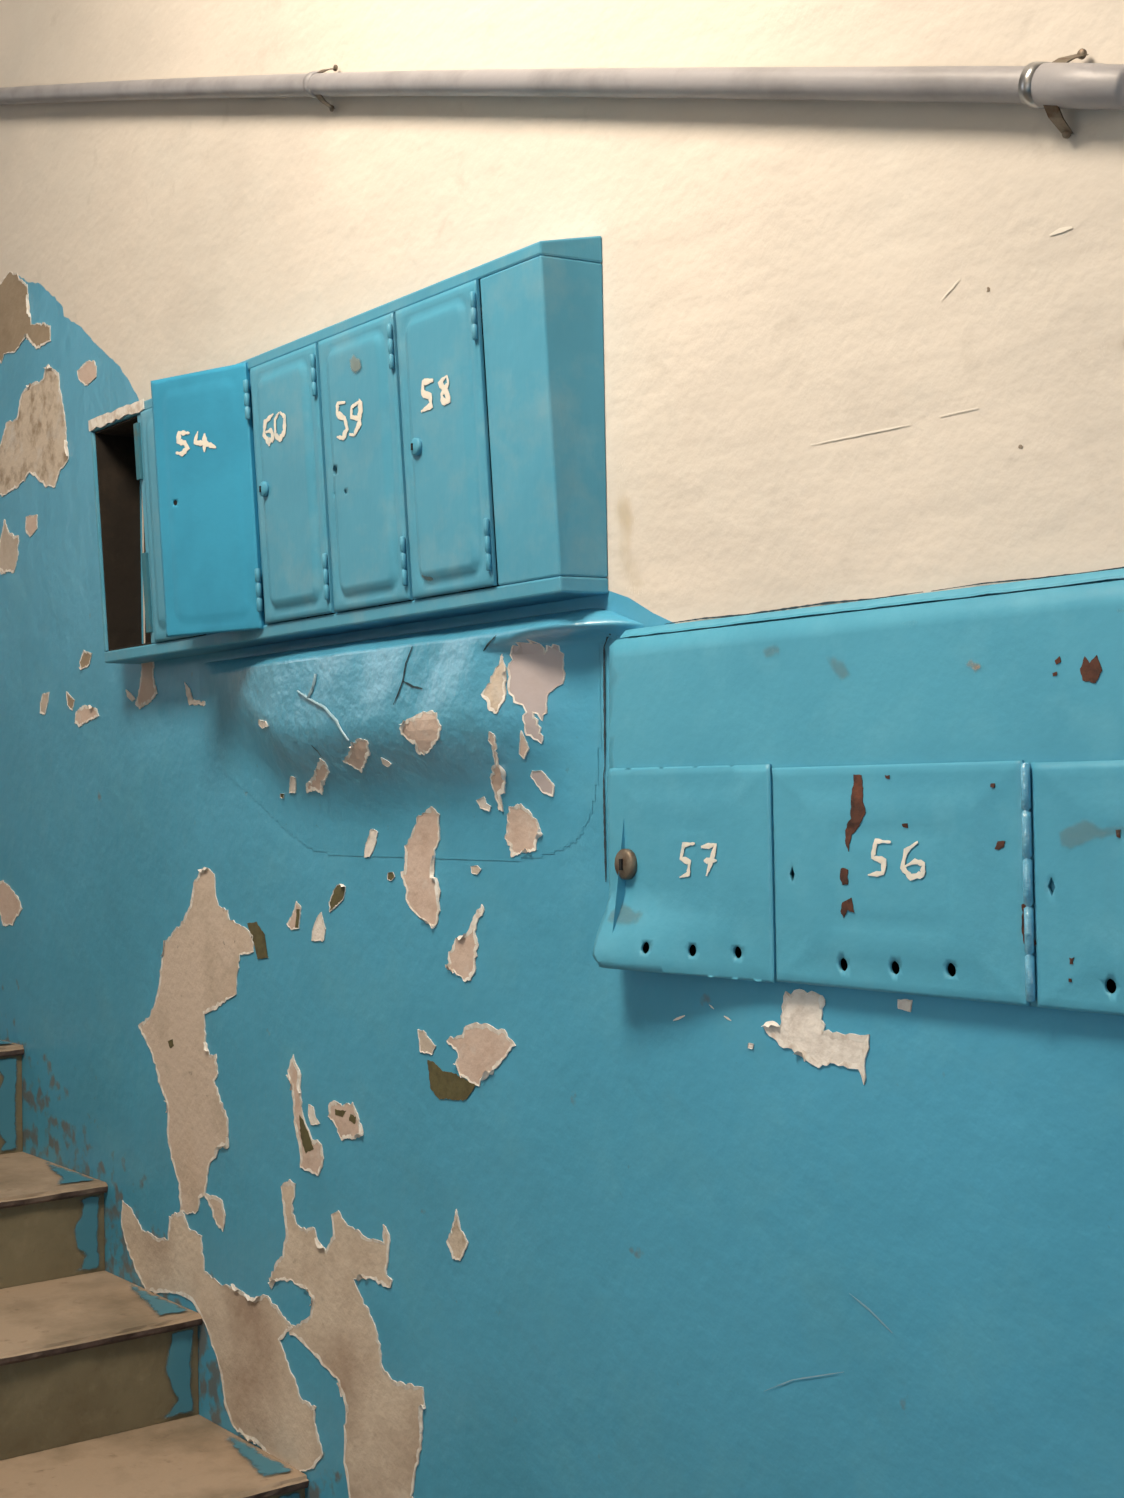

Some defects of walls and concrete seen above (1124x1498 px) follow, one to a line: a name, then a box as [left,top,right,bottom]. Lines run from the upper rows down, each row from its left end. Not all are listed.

peeling [0,271,97,497]
peeling [0,514,38,574]
peeling [481,639,566,797]
rust [1080,655,1102,683]
peeling [0,880,23,926]
peeling [387,806,441,928]
peeling [445,904,485,982]
peeling [476,731,543,857]
rust [840,774,866,918]
peeling [417,1022,516,1101]
peeling [748,989,870,1085]
peeling [121,867,426,1498]